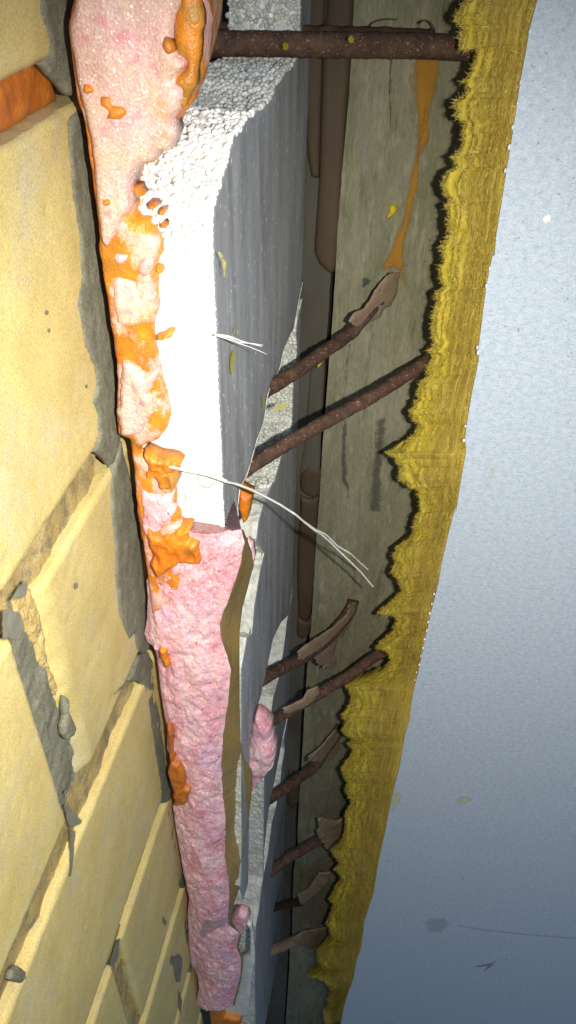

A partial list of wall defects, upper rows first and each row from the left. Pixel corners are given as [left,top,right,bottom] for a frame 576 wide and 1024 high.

corrosion [383,59,439,282]
spalling [280,299,302,373]
spalling [238,457,281,740]
spalling [259,590,293,711]
spalling [231,718,288,956]
spalling [241,963,255,1024]